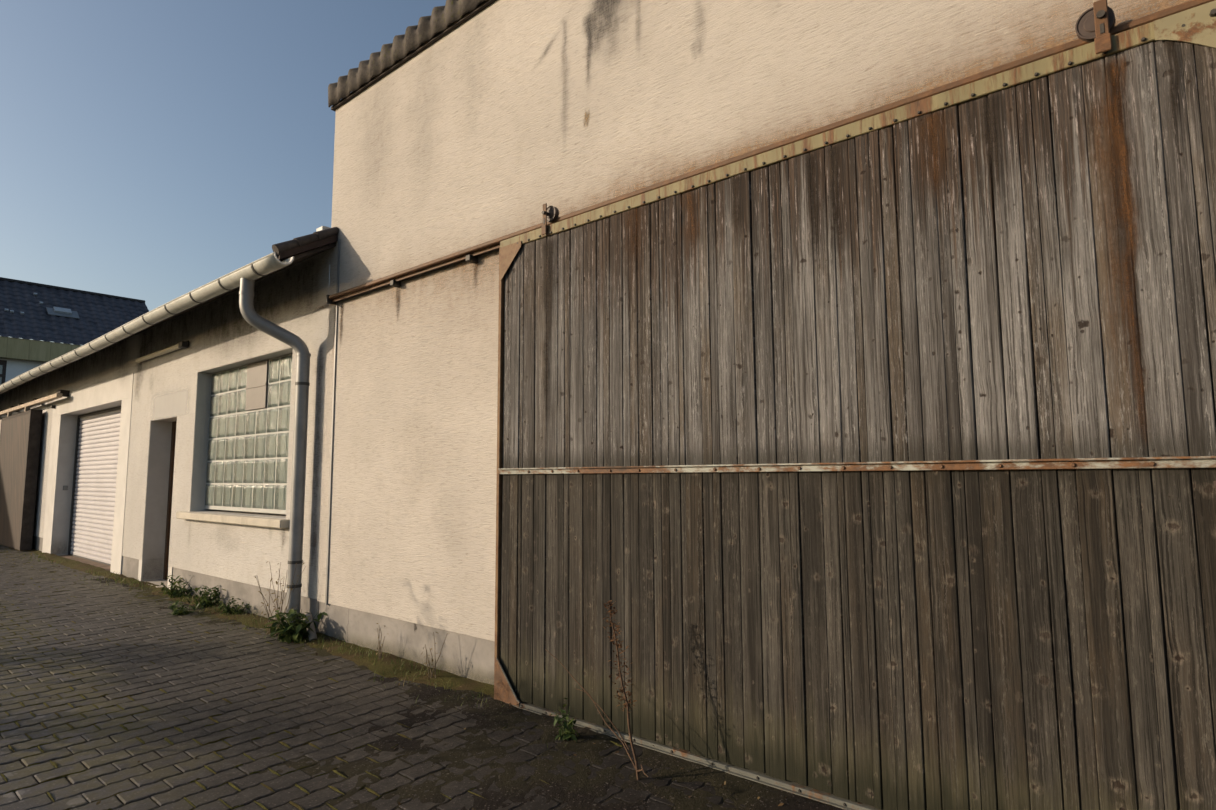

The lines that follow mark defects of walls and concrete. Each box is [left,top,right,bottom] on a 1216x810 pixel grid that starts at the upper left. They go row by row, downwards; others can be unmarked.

water stain [586,0,618,68]
corrosion [871,15,1079,108]
corrosion [1114,0,1190,27]